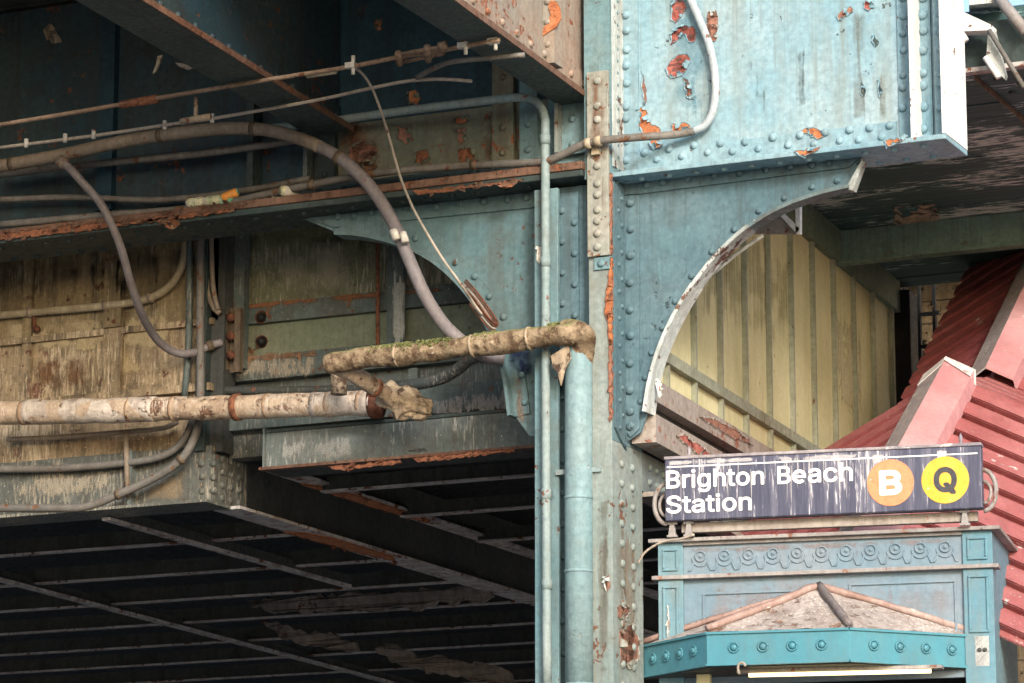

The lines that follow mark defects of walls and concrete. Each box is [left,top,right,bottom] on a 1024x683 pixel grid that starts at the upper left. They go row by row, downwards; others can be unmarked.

peeling [543,0,562,36]
peeling [665,0,719,100]
corrosion [347,140,378,171]
peeling [795,127,824,159]
corrosion [412,178,524,197]
corrosion [0,200,237,241]
corrosion [604,173,614,422]
corrosion [327,448,515,472]
peeling [676,433,711,455]
peeling [699,416,753,446]